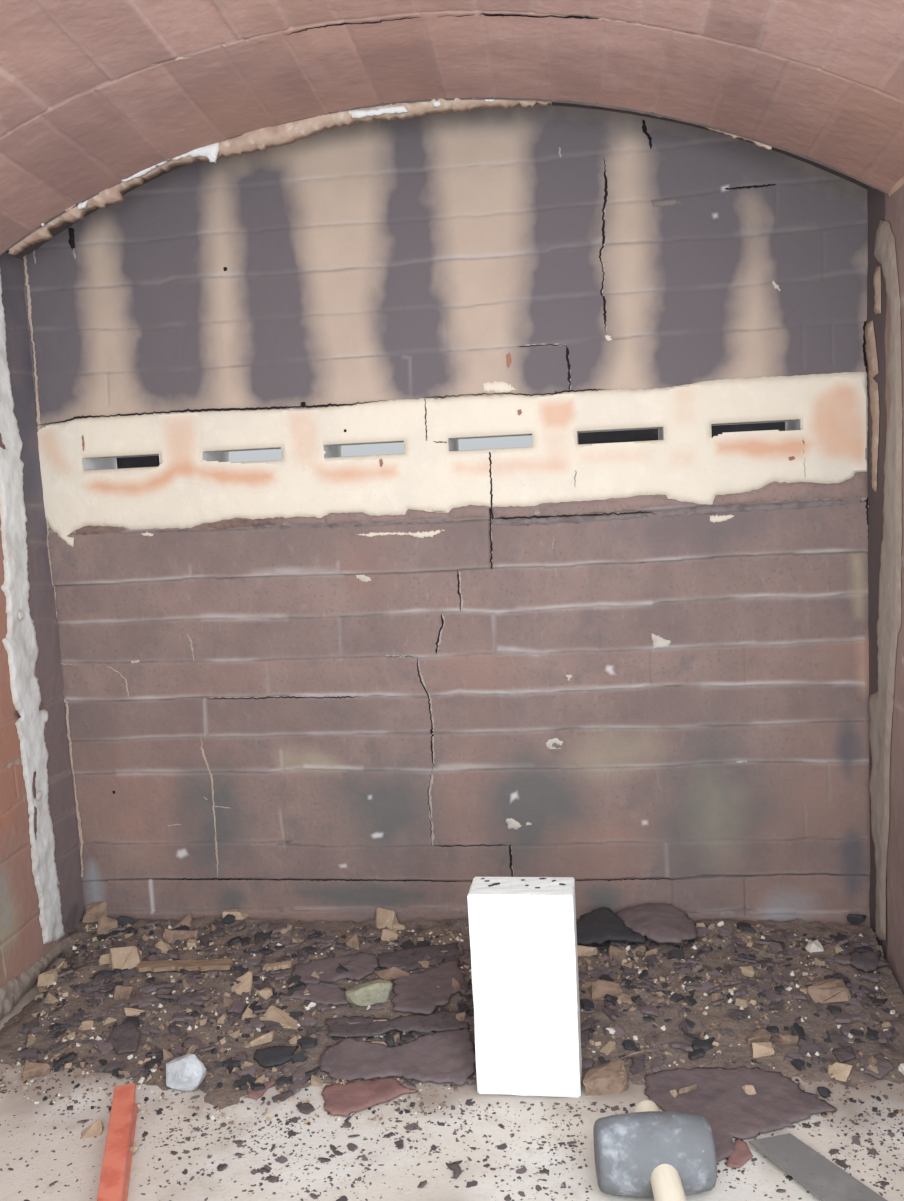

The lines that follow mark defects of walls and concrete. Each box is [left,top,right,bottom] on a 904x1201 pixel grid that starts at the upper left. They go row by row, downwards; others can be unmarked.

crack [222,13,699,47]
crack [599,160,608,335]
rust [37,410,406,502]
rust [446,393,657,482]
rust [667,385,702,430]
rust [709,376,867,471]
crack [487,452,495,569]
crack [386,571,463,845]